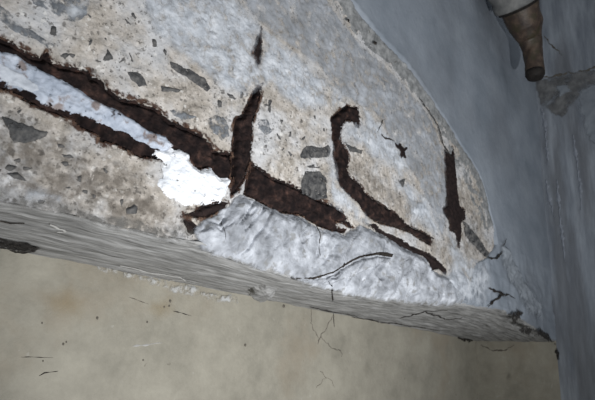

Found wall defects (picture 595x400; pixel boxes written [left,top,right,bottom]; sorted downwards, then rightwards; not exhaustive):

rust [251,26,263,66]
flaking render [536,70,595,116]
rust [46,112,163,162]
rust [85,67,264,234]
spalling [0,0,494,304]
crack [488,288,516,307]
crack [311,307,461,357]
spalling [519,327,556,345]